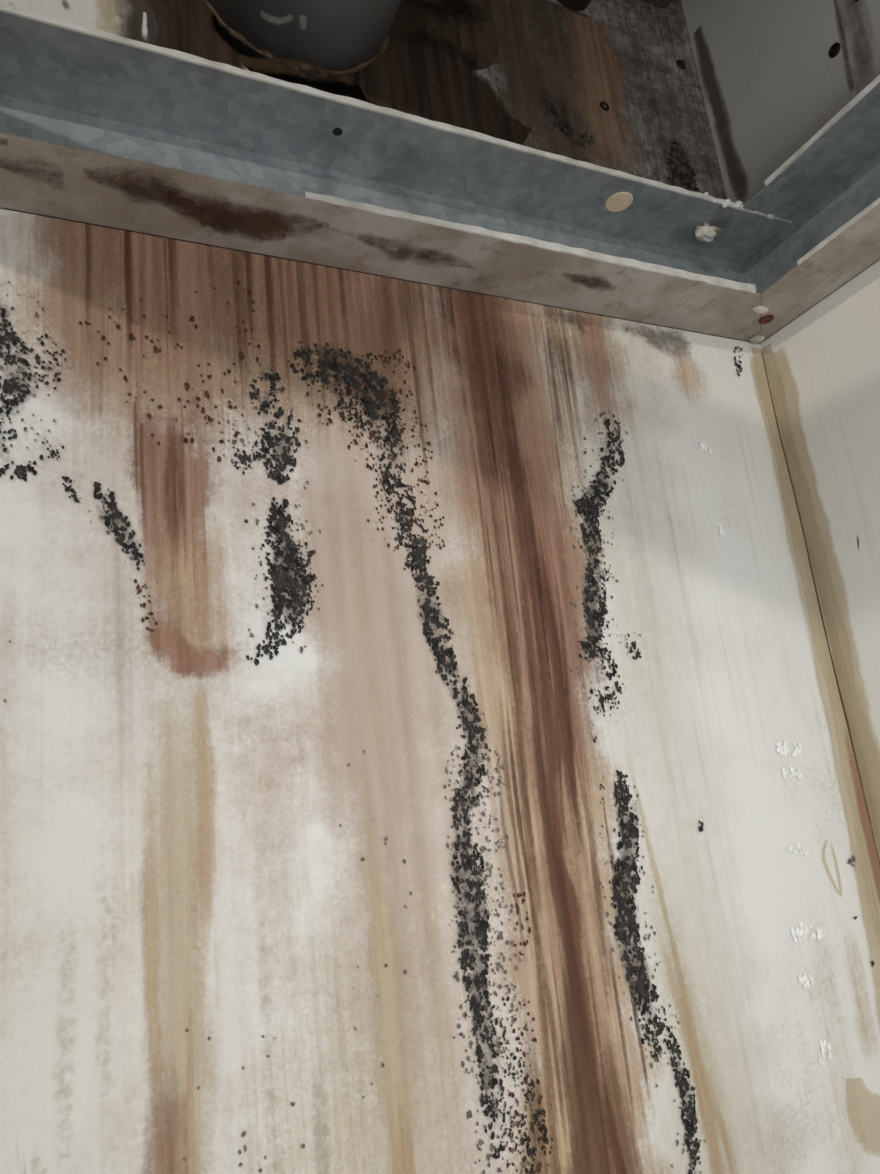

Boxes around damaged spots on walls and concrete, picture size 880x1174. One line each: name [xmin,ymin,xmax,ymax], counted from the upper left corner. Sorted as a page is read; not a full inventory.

leakage [357,0,747,200]
leakage [0,219,553,1174]
leakage [546,306,642,743]
leakage [599,770,736,1174]